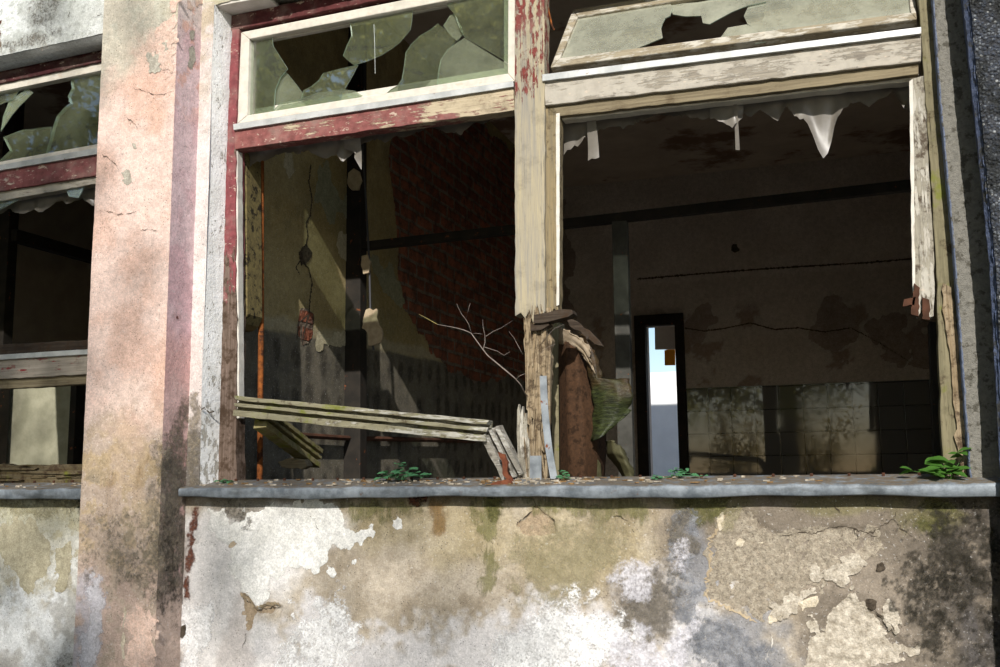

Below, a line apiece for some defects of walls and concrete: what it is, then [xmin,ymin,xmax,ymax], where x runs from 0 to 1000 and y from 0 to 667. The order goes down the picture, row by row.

crack [296,165,313,344]
flaking render [388,123,525,384]
crack [685,322,906,360]
water stain [78,392,215,667]
peeling [207,499,376,630]
spalling [703,510,920,667]
water stain [882,501,1000,665]